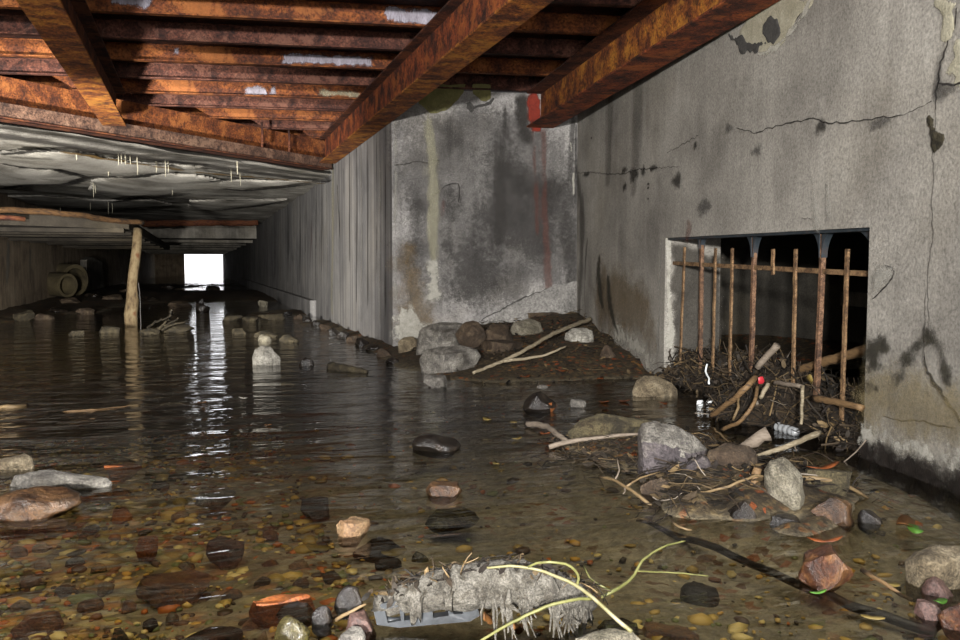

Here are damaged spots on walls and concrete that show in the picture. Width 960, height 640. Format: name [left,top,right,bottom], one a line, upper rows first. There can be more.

peeling [728,0,814,56]
crack [738,8,960,133]
peeling [934,0,960,87]
leakage [515,95,532,143]
rust [527,94,541,131]
crack [578,135,698,175]
leakage [426,260,441,301]
crack [883,152,960,428]
leakage [857,377,960,506]